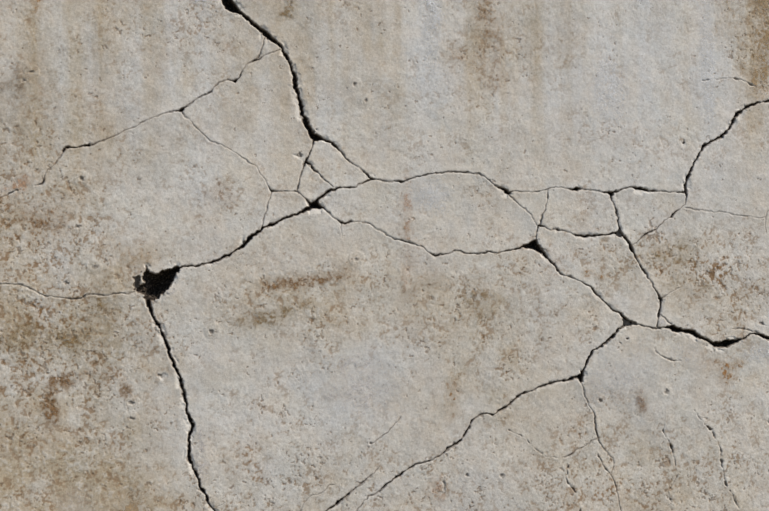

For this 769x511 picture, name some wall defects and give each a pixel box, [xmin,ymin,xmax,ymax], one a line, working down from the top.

crack [35,0,374,269]
crack [0,283,225,511]
crack [325,466,380,511]
crack [356,99,769,511]